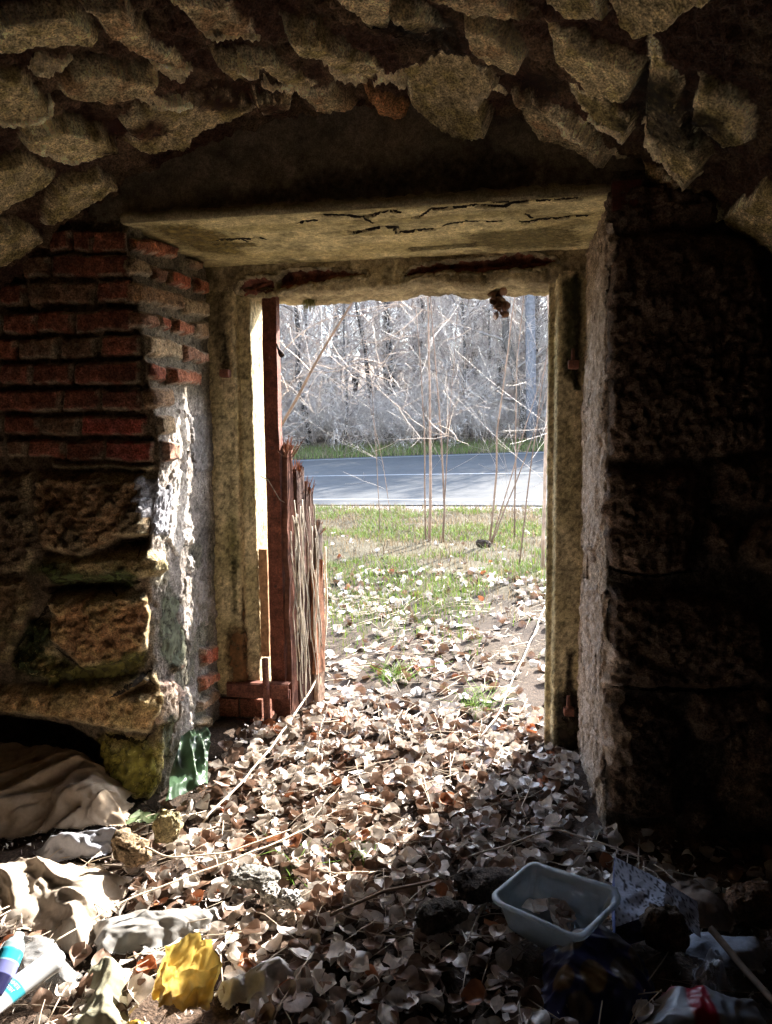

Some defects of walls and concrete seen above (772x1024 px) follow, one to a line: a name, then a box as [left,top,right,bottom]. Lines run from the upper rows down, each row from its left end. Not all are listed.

crack [298,197,588,236]
crack [216,235,267,243]